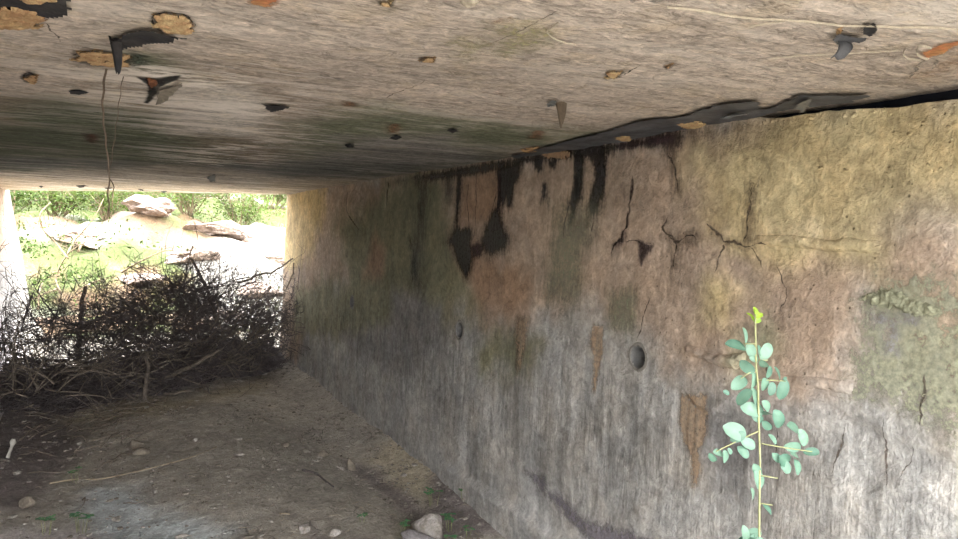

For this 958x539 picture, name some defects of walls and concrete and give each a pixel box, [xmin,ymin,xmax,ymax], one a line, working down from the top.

spalling [0,0,72,31]
spalling [151,11,197,35]
spalling [69,49,182,105]
spalling [604,67,637,79]
rust [903,41,958,77]
spalling [677,121,706,129]
damp [535,158,556,172]
damp [563,145,609,238]
damp [437,163,521,277]
crack [662,183,787,309]